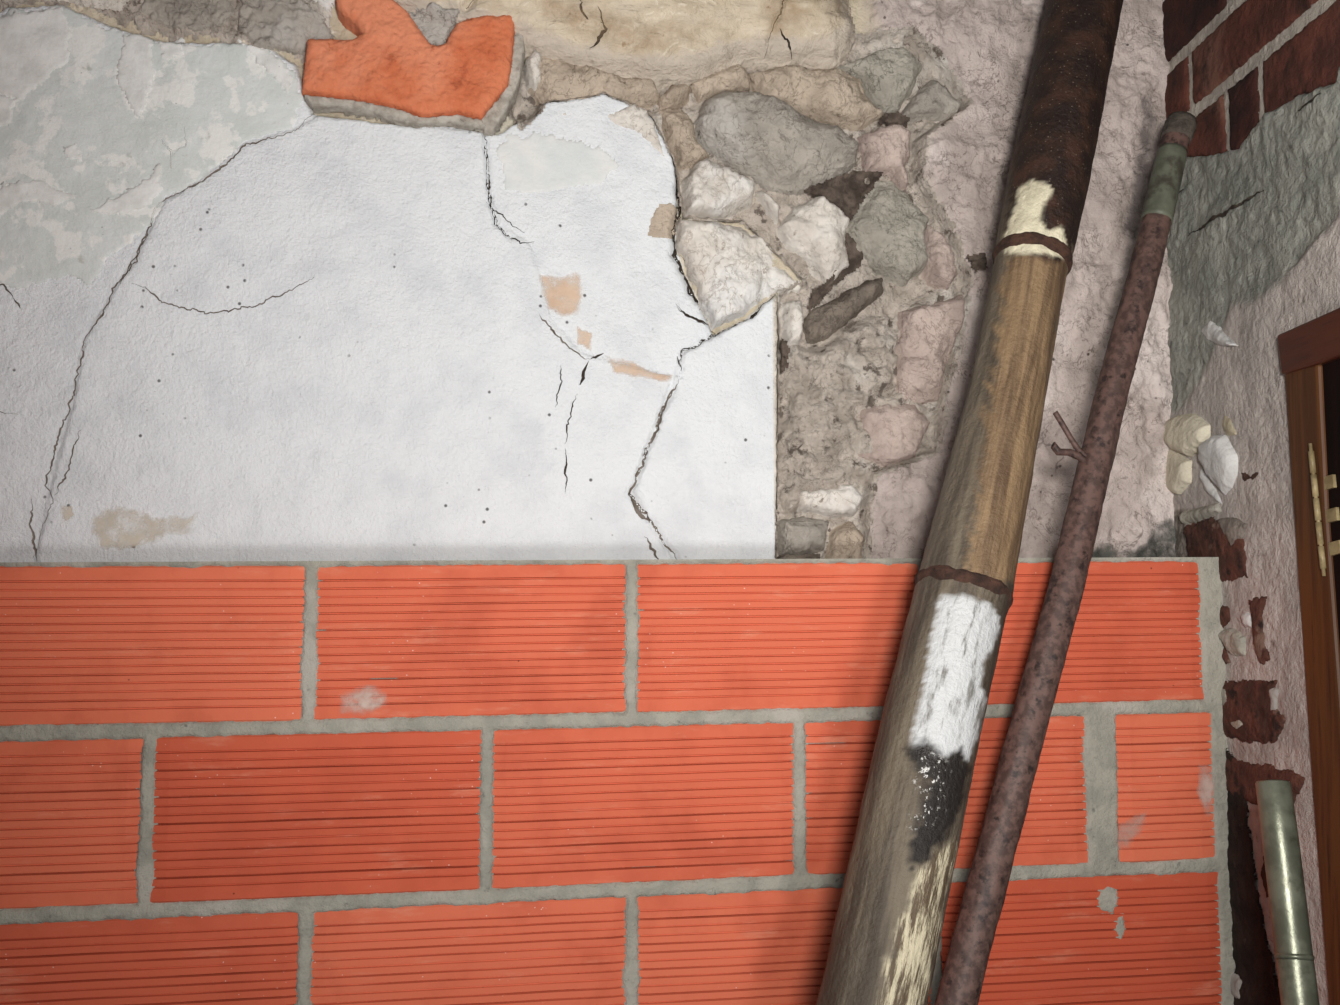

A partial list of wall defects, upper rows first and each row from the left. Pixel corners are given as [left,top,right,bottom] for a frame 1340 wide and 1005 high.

peeling [0,0,336,290]
flaking render [409,2,460,46]
crack [484,138,530,244]
crack [580,0,608,48]
crack [764,0,792,59]
flaking render [1162,0,1340,157]
crack [29,114,314,558]
crack [539,314,604,492]
crack [628,179,774,559]
spalling [510,25,988,559]
flaking render [1218,596,1286,744]
flaking render [1225,757,1305,805]